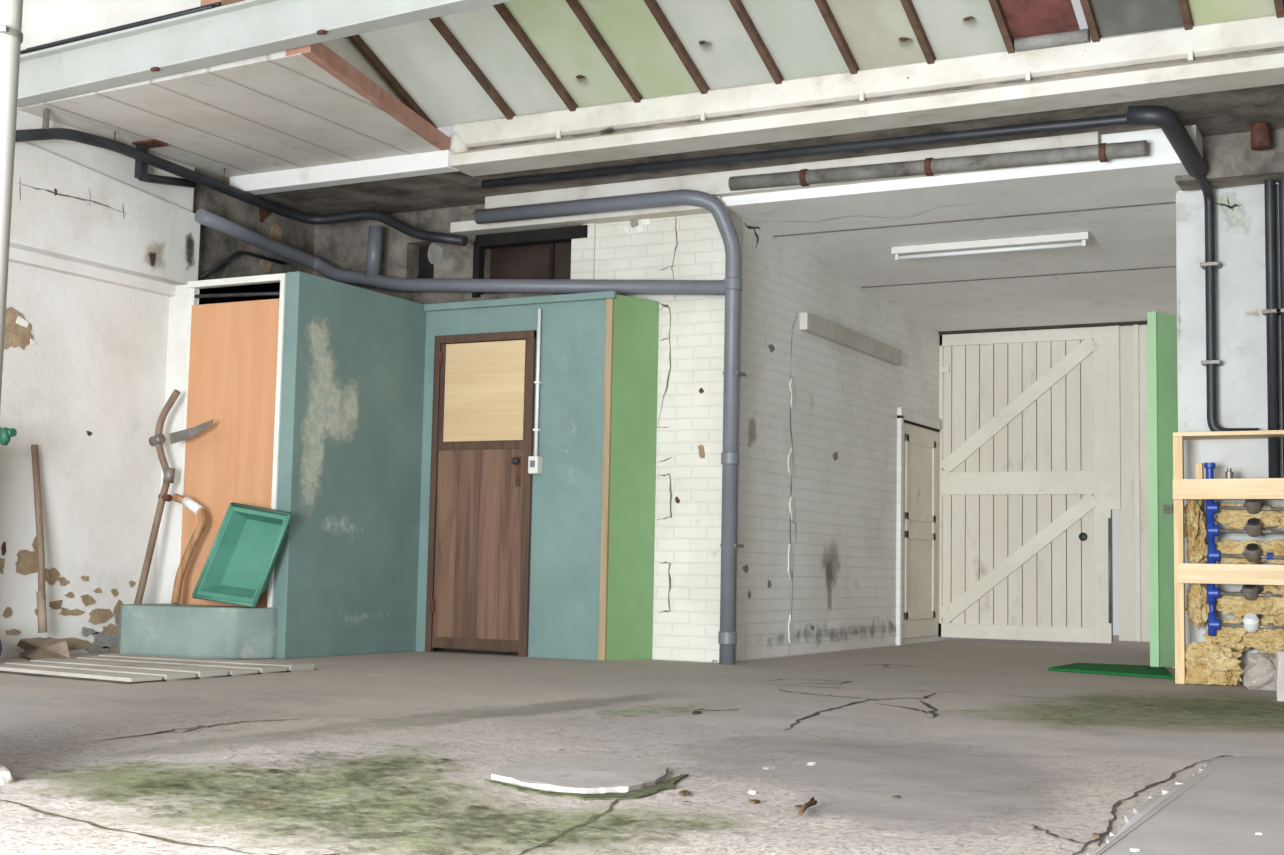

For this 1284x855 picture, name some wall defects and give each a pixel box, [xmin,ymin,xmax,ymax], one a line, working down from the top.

flaking render [4,307,36,350]
peeling [301,319,358,505]
crack [666,312,1099,730]
peeling [0,537,136,653]
crack [100,717,311,741]
crack [1,800,278,855]
crack [1032,755,1229,855]